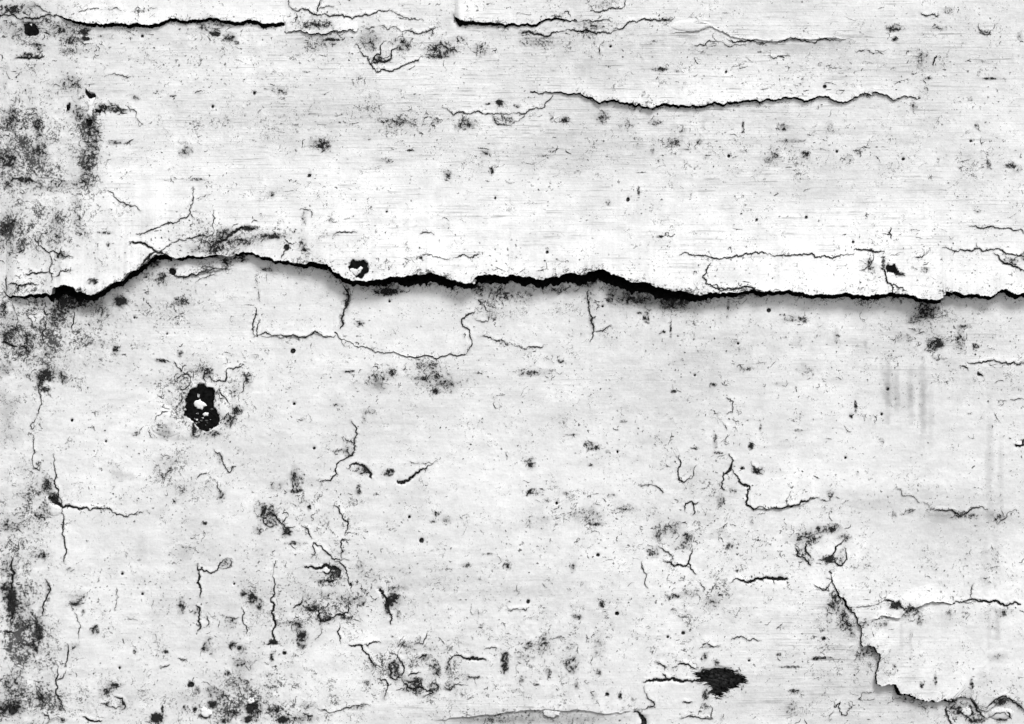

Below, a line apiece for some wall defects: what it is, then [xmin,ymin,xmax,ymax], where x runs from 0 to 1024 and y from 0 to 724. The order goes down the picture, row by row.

peeling [56,0,358,37]
peeling [454,0,575,25]
peeling [669,2,854,41]
peeling [87,98,95,118]
peeling [534,56,919,108]
peeling [5,148,1024,300]
crack [0,106,1024,633]
peeling [194,394,209,416]
crack [576,326,1024,724]
crack [0,421,547,724]
peeling [831,529,1024,716]